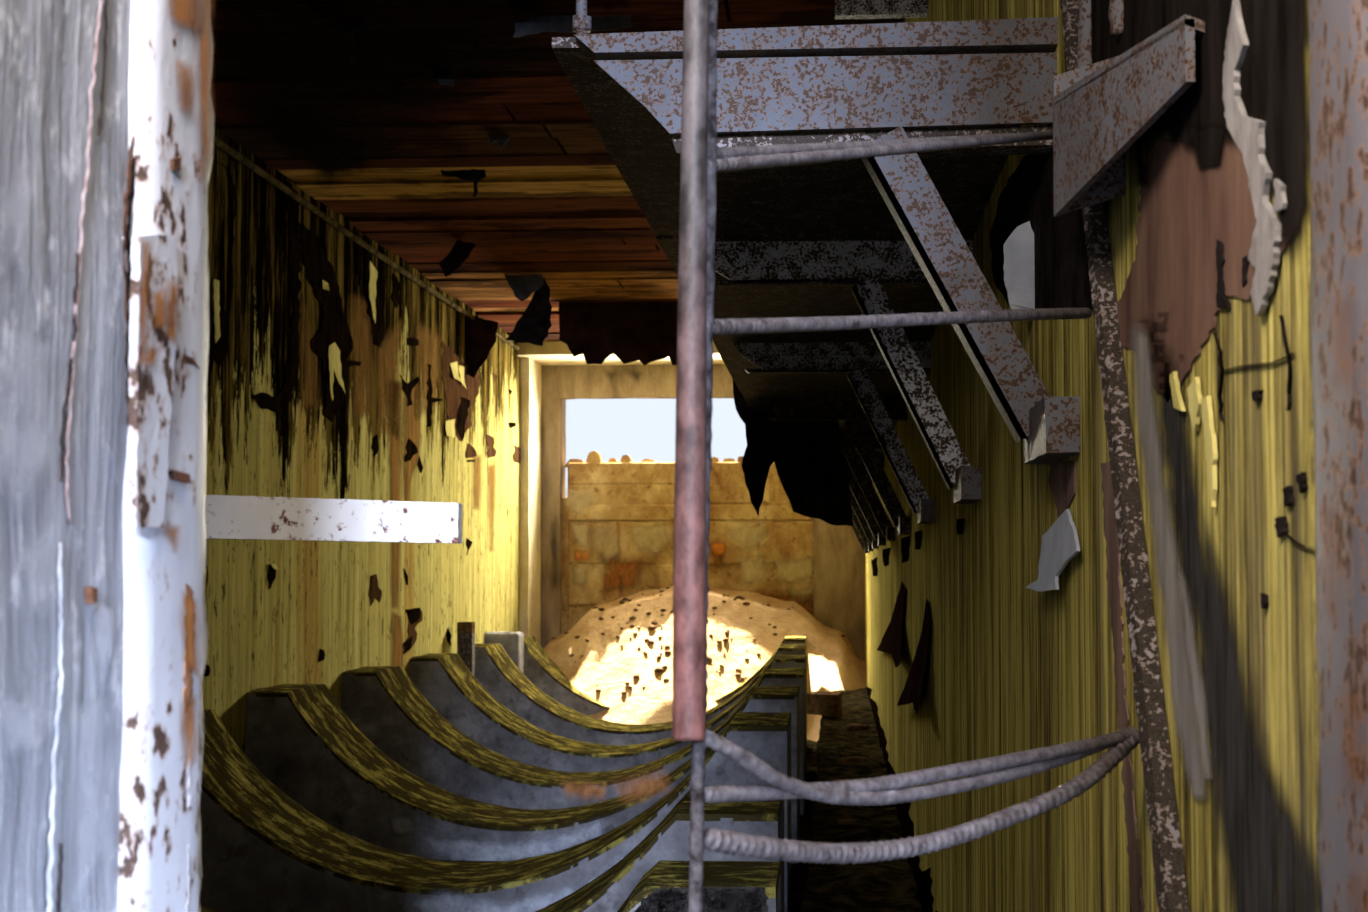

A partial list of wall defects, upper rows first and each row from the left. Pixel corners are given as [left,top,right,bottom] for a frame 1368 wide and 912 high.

rust [170,0,209,154]
rust [169,157,181,170]
rust [139,243,177,365]
peeling [207,163,237,386]
peeling [252,181,362,422]
peeling [354,242,400,347]
peeling [1117,0,1287,507]
peeling [404,438,423,473]
spalling [1274,472,1309,538]
rust [185,595,197,673]
spalling [1260,593,1269,609]
rust [183,700,194,763]